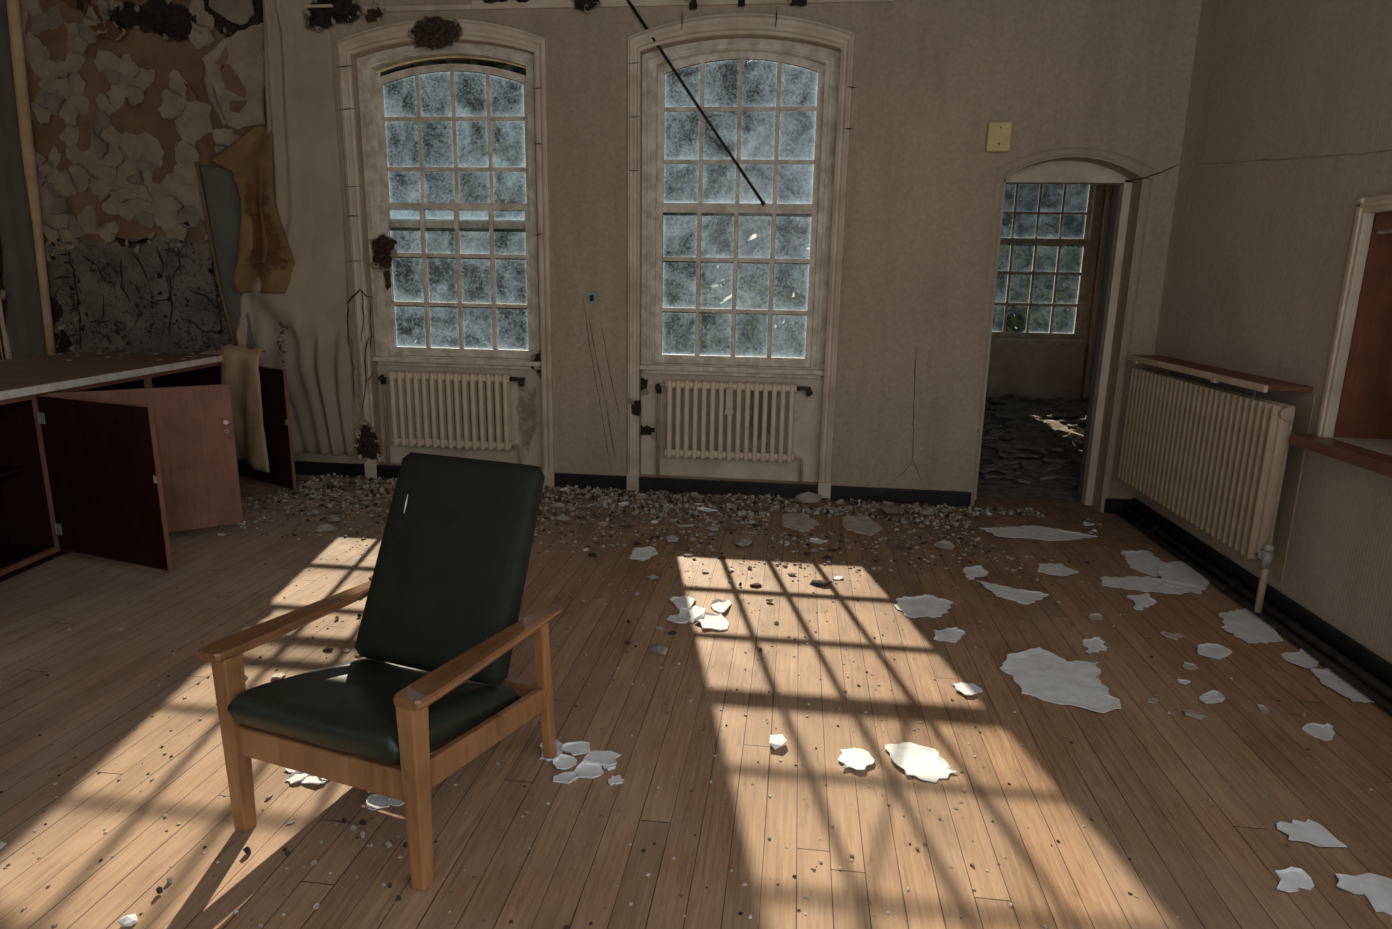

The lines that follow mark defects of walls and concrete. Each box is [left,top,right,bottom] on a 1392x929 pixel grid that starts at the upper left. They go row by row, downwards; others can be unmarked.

spalling [303,0,386,32]
spalling [408,16,462,51]
spalling [571,0,602,14]
peeling [21,0,267,353]
crack [48,221,233,354]